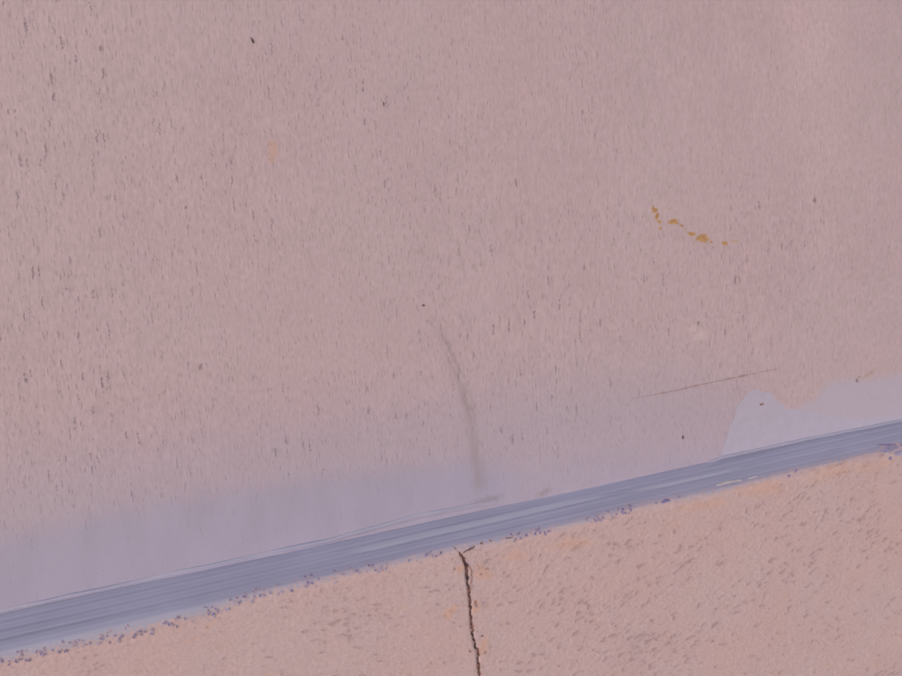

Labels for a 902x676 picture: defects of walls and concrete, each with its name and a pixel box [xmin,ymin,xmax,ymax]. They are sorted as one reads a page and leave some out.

crack [454,537,514,676]